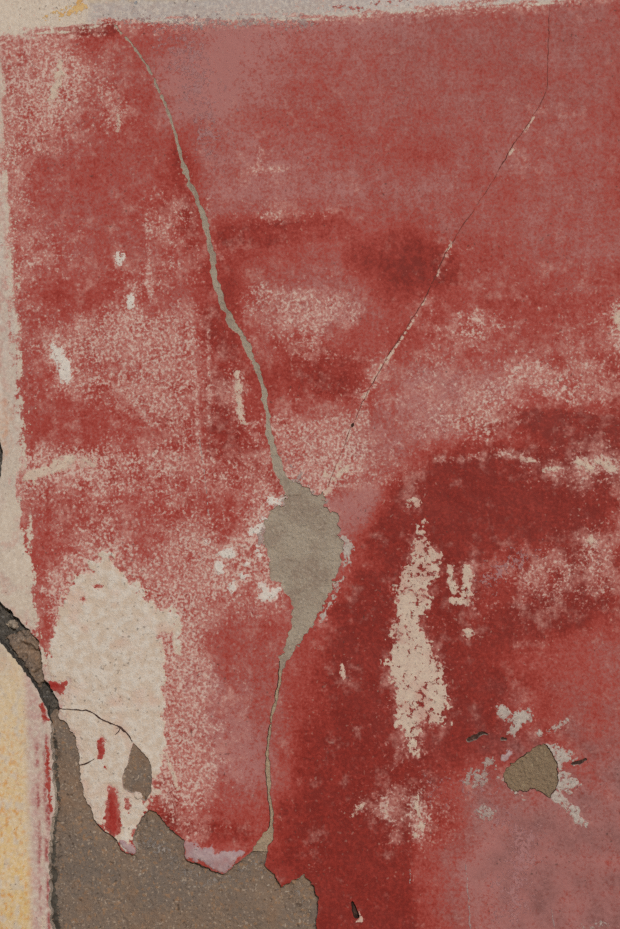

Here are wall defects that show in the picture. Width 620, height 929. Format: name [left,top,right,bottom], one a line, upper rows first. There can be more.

crack [114,25,301,495]
crack [328,14,550,485]
crack [0,602,132,741]
spalling [47,550,319,929]
crack [253,661,283,851]
spalling [214,470,344,670]
peeling [380,518,453,759]
spalling [497,743,559,801]